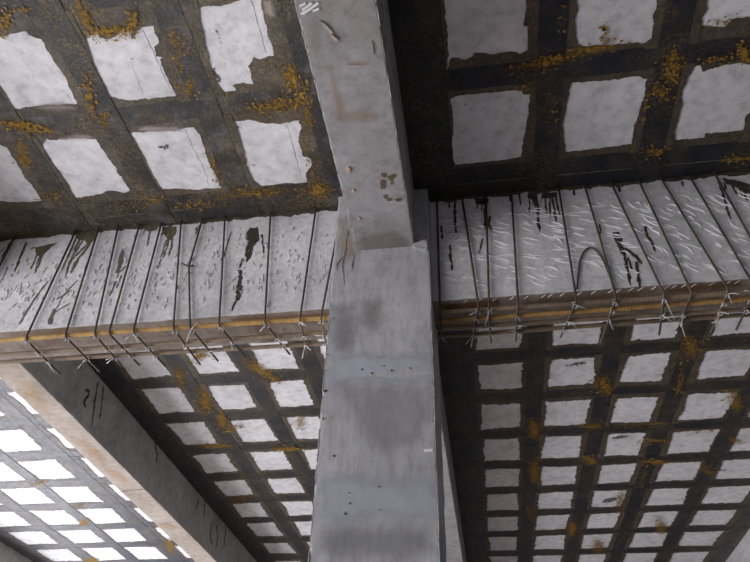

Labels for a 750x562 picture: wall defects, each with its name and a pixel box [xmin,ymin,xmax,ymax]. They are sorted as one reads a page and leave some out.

rust [68,0,144,44]
rust [498,21,630,76]
rust [697,40,750,66]
rust [77,73,114,129]
rust [639,44,687,121]
rust [0,114,58,171]
rust [109,63,341,212]
damp [430,171,750,254]
damp [0,209,338,311]
rust [171,348,245,449]
rust [235,356,284,386]
rust [576,420,745,445]